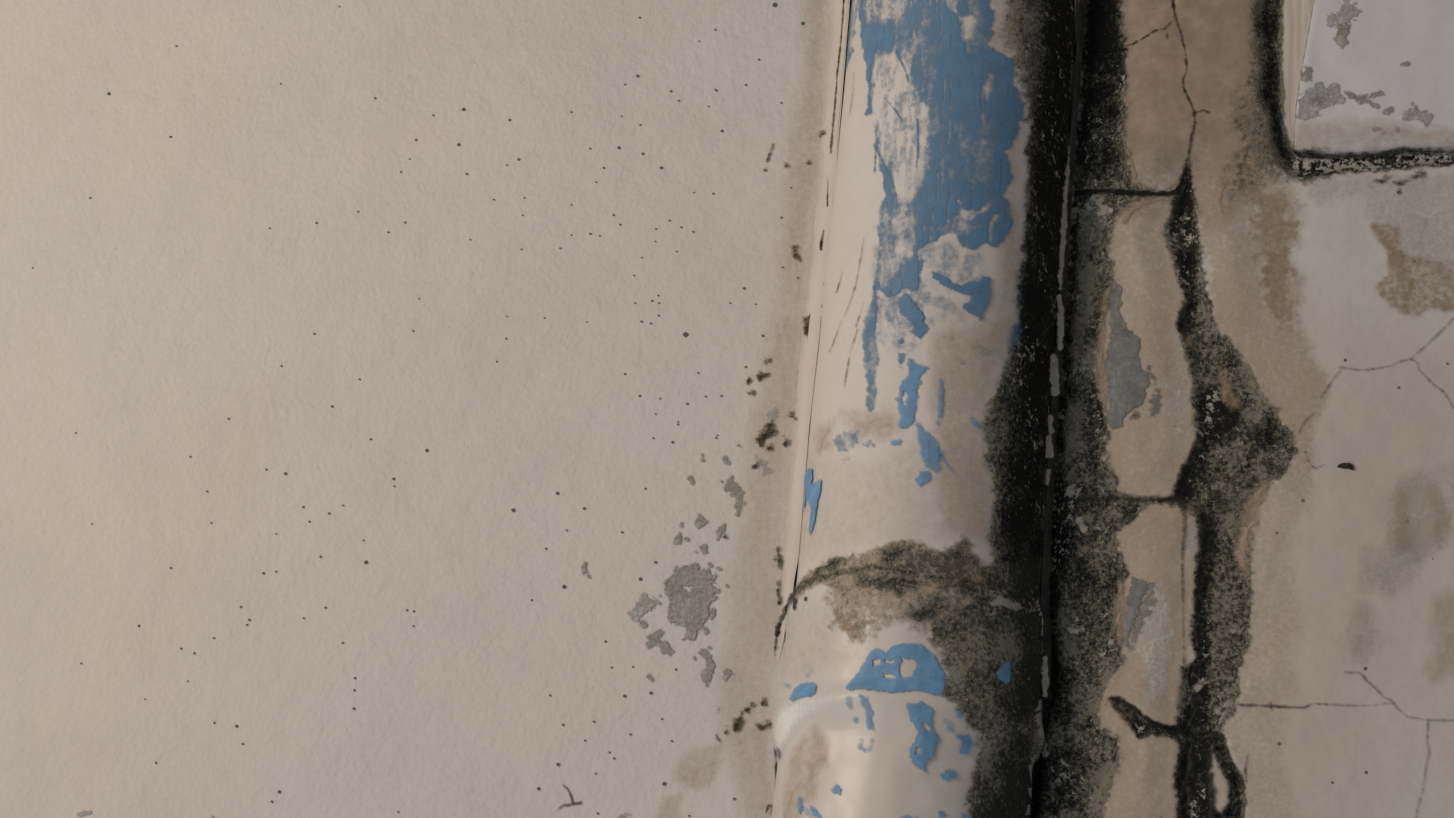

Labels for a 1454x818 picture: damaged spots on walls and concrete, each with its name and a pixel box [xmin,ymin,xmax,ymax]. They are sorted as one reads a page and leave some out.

crack [1075,0,1208,197]
spalling [1326,0,1361,49]
spalling [1294,66,1433,134]
peeling [834,0,1025,486]
leakage [774,0,1454,818]
spalling [1104,284,1190,443]
spalling [627,453,745,687]
peeling [787,682,816,701]
peeling [846,643,972,781]
peeling [797,797,820,818]